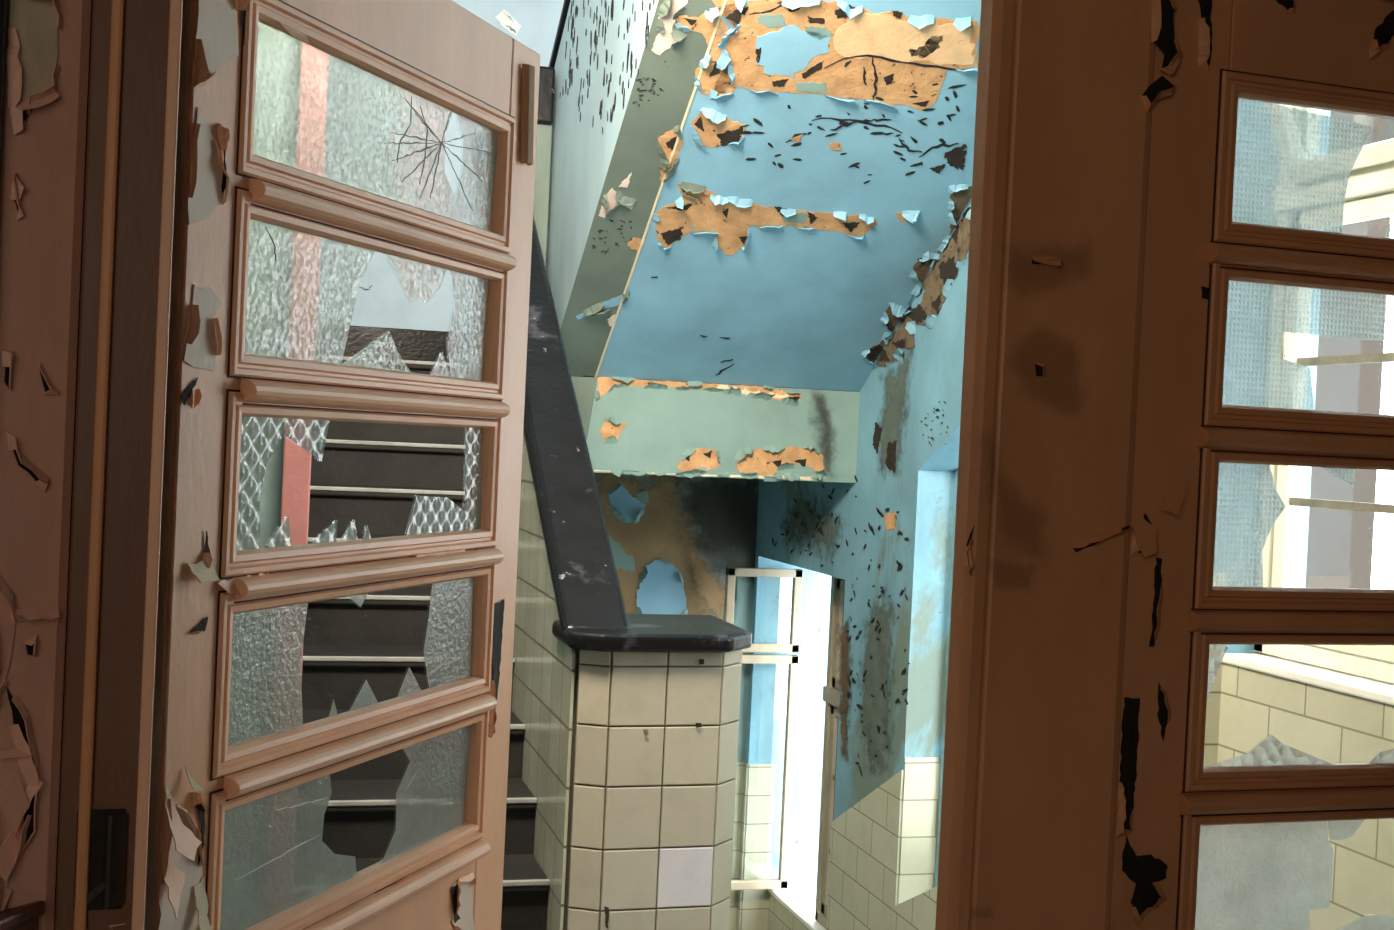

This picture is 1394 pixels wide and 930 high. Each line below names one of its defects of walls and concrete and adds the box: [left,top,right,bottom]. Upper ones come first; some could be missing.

peeling [627,0,980,255]
flaking render [599,172,638,218]
peeling [576,291,630,326]
peeling [594,444,840,556]
peeling [608,535,688,615]
peeling [0,748,40,911]